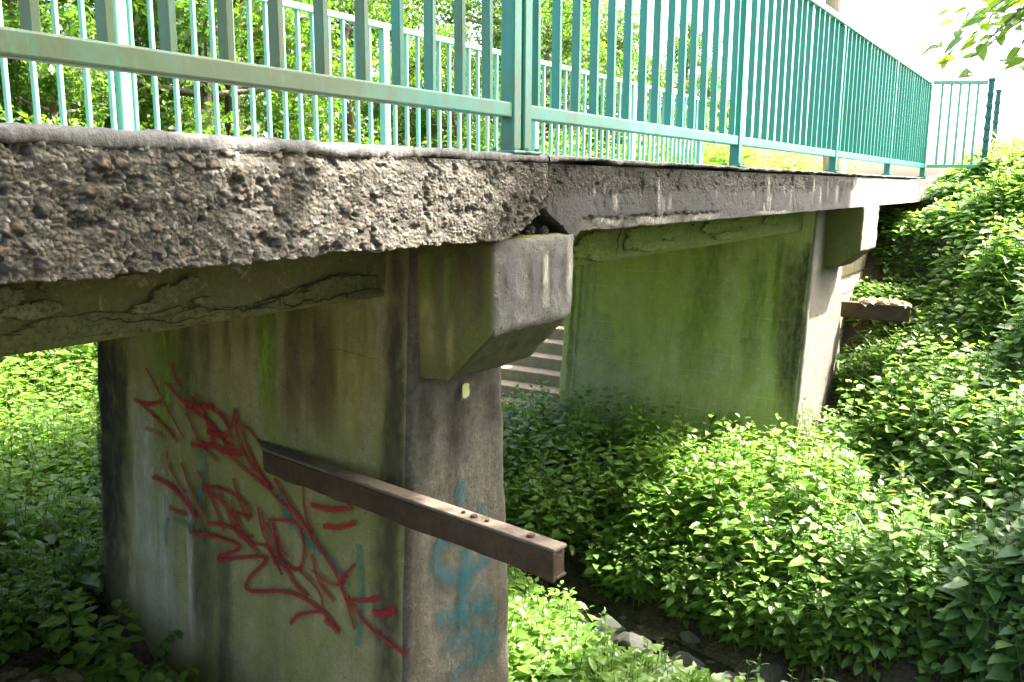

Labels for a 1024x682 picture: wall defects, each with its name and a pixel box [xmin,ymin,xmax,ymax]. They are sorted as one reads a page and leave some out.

crack [84,272,371,324]
damp [384,256,431,487]
damp [773,253,809,390]
damp [96,339,127,575]
damp [377,521,399,682]